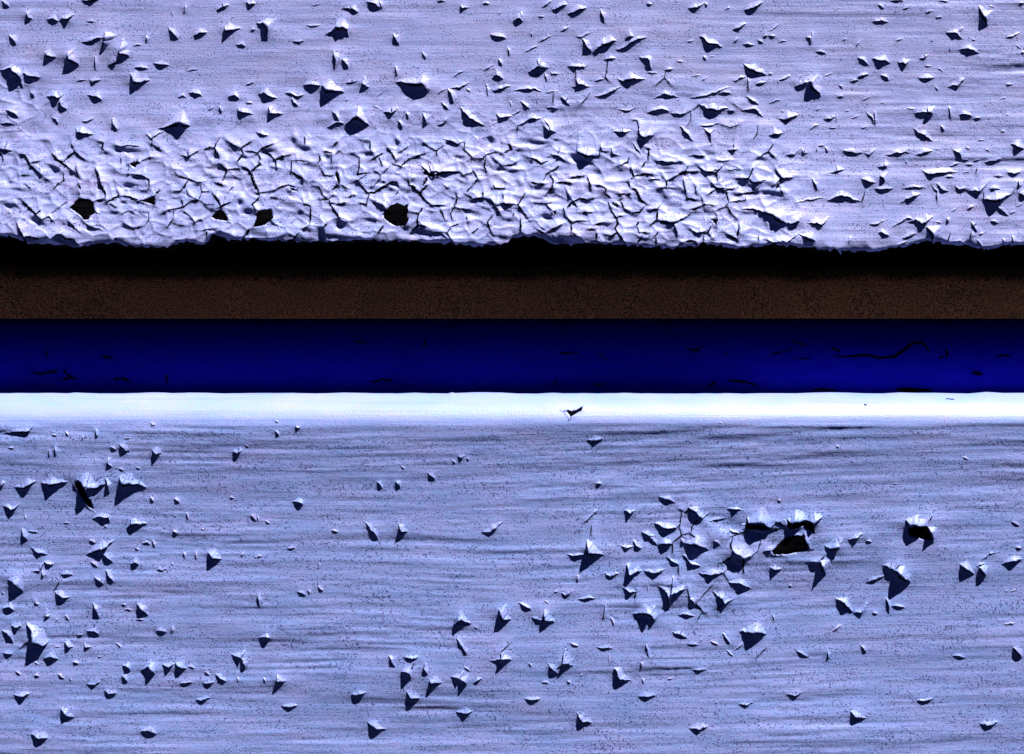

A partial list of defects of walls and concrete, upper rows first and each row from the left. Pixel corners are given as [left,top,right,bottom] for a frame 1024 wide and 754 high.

peeling [619,63,829,189]
peeling [65,194,105,231]
peeling [207,205,281,239]
crack [0,93,786,249]
peeling [376,198,413,230]
peeling [737,178,861,245]
peeling [843,128,1024,250]
crack [970,169,1016,203]
peeling [15,457,146,520]
peeling [605,521,751,622]
crack [667,505,785,620]
peeling [659,495,863,574]